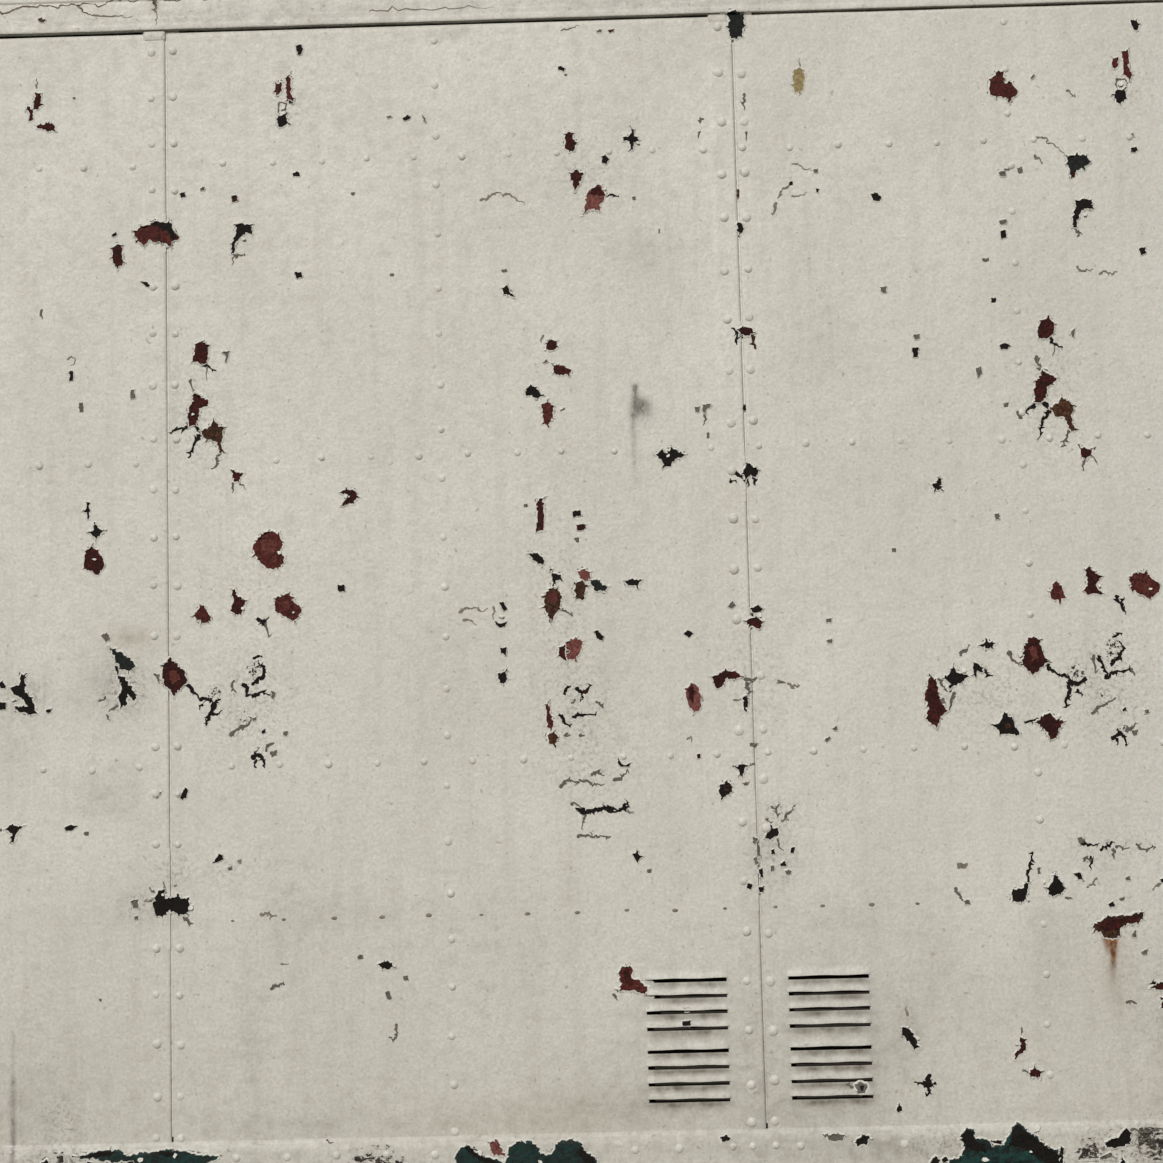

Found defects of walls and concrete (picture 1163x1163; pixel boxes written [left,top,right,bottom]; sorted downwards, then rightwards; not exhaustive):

peeling [105,213,187,276]
peeling [169,335,250,493]
peeling [1003,311,1101,471]
peeling [246,525,309,627]
peeling [916,630,1056,734]
crack [1046,595,1147,756]
crack [540,660,634,839]
rust [1079,888,1153,1006]
rust [1143,980,1163,1018]
peeling [63,1146,228,1163]
peeling [282,1137,630,1163]
peeling [928,1121,1163,1163]